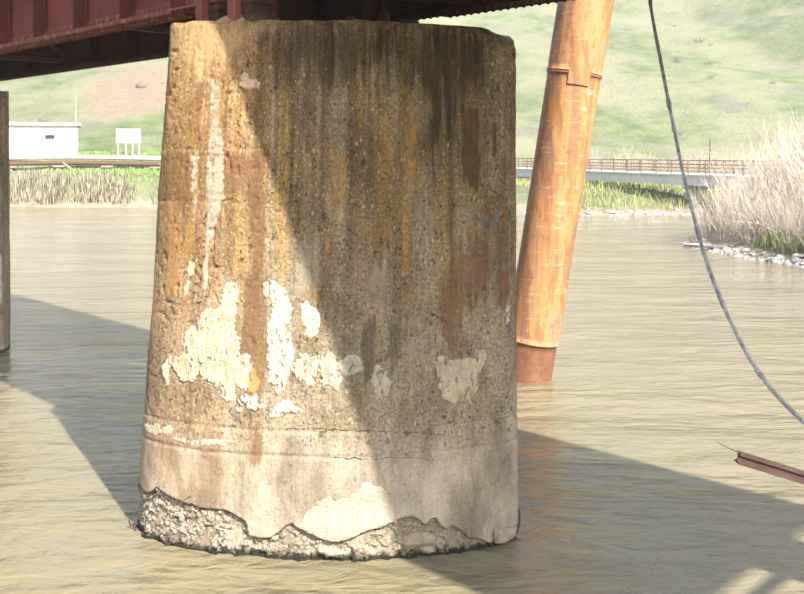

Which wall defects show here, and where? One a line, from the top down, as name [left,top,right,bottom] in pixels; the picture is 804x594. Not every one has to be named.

leakage [267,27,483,145]
peeling [184,261,209,297]
peeling [161,274,392,418]
peeling [432,346,487,410]
crack [317,427,442,435]
spalling [135,482,495,562]